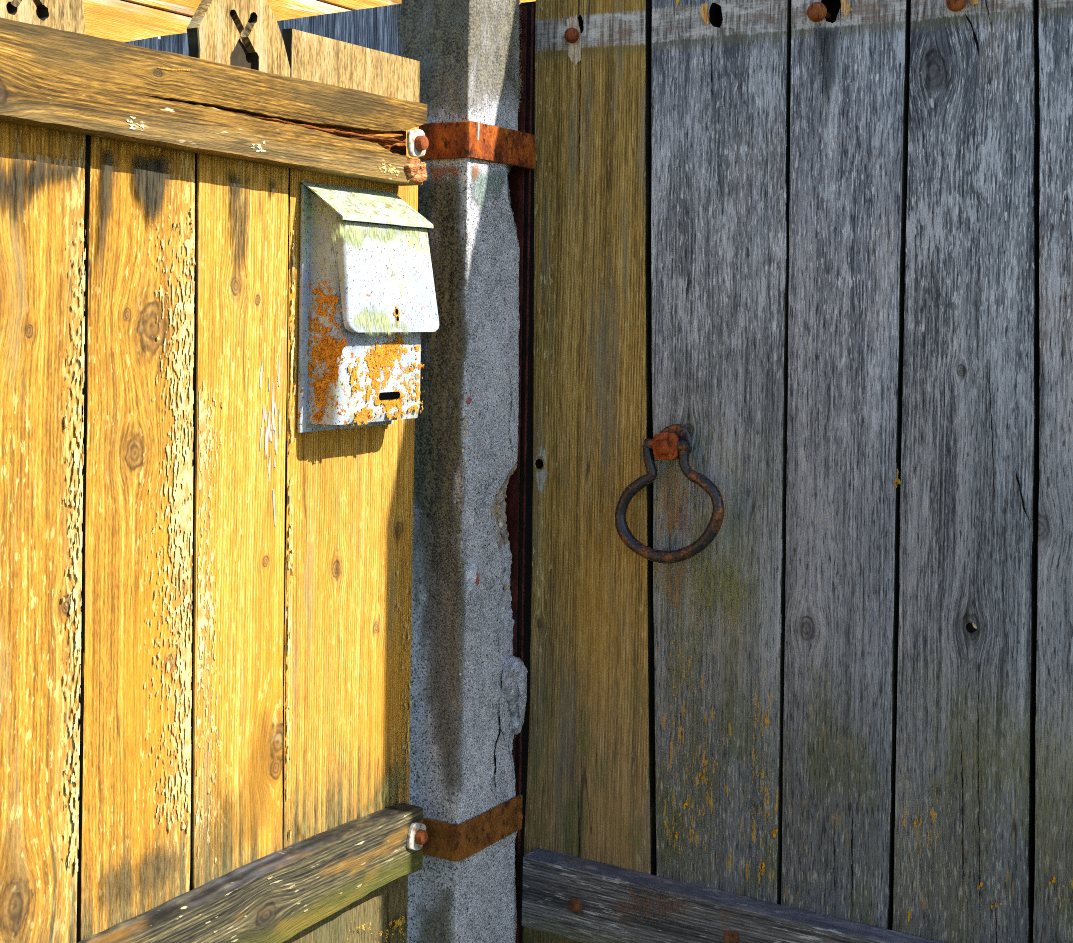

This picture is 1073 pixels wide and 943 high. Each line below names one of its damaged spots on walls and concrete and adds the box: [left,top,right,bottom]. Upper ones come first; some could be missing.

damp [0,153,77,215]
damp [101,149,113,258]
damp [133,154,169,222]
crack [220,109,406,156]
damp [340,227,396,249]
damp [473,172,504,210]
rust [307,277,424,427]
peeling [142,204,226,864]
damp [410,170,471,797]
spalling [491,458,518,666]
crack [492,670,506,799]